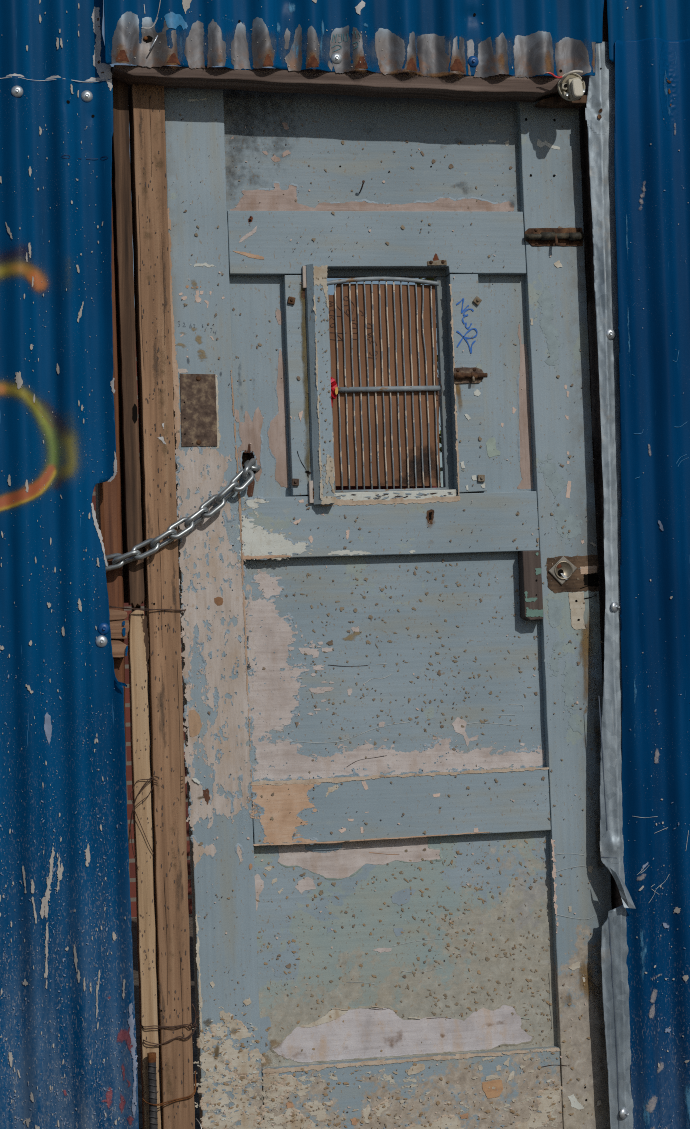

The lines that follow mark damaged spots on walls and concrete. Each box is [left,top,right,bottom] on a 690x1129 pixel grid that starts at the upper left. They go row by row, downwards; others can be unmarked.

rust [306,53,319,68]
rust [391,57,465,77]
peeling [313,265,485,516]
peeling [501,318,534,491]
peeling [175,348,546,911]
peeling [193,998,584,1129]